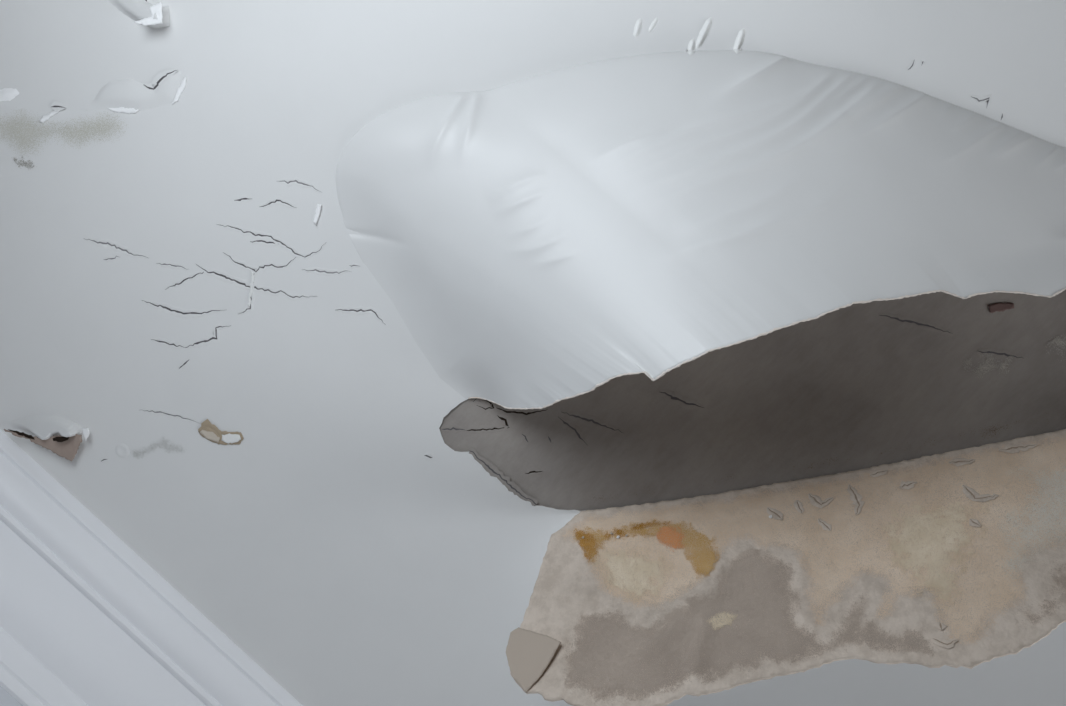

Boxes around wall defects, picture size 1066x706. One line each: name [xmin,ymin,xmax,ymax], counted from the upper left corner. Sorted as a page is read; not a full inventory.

peeling [79,69,187,114]
crack [83,177,386,369]
peeling [198,419,244,445]
flaking render [440,290,1066,706]
water stain [563,545,935,703]